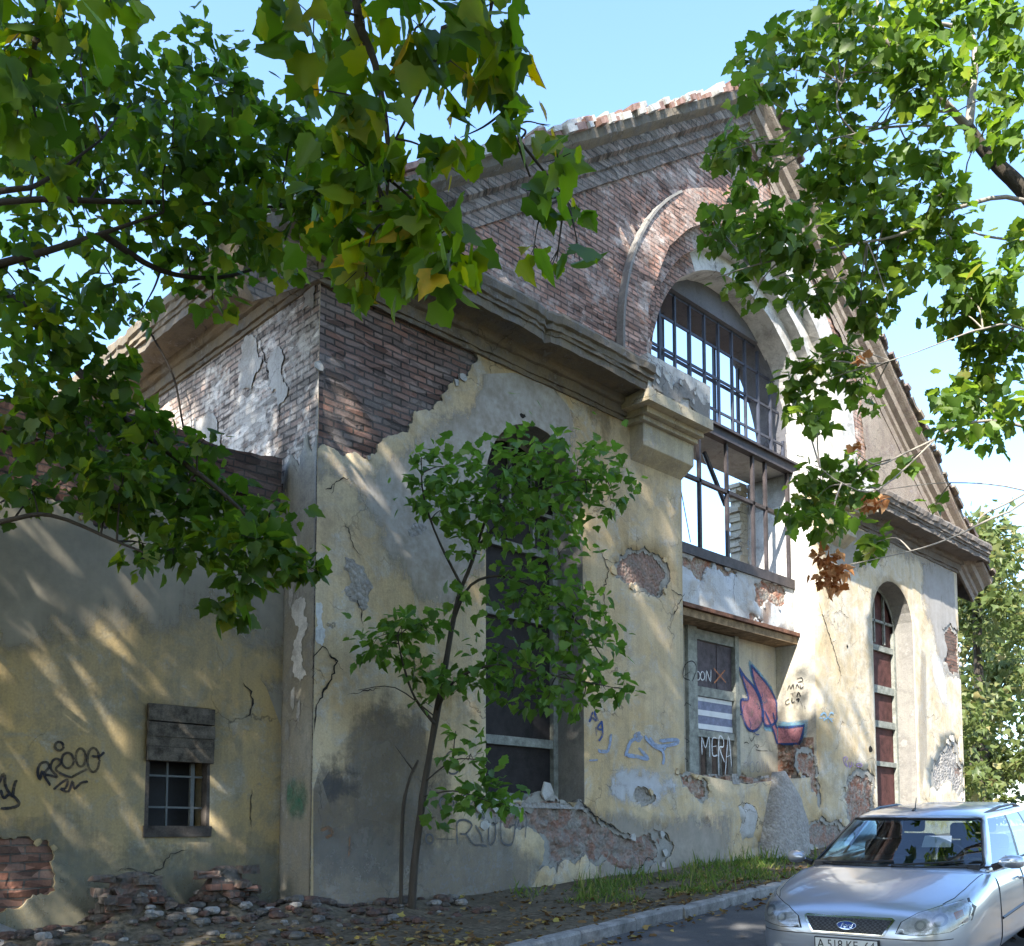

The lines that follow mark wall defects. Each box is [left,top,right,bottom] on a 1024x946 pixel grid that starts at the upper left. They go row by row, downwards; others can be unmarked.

flaking render [314,283,581,603]
crack [243,683,254,718]
peeling [285,582,325,741]
crack [312,646,379,730]
flaking render [610,547,670,598]
flaking render [682,557,738,581]
flaking render [749,580,785,622]
peeling [922,563,962,679]
spalling [474,782,673,875]
flaking render [793,745,875,850]
flaking render [931,736,964,799]
flaking render [0,836,58,912]